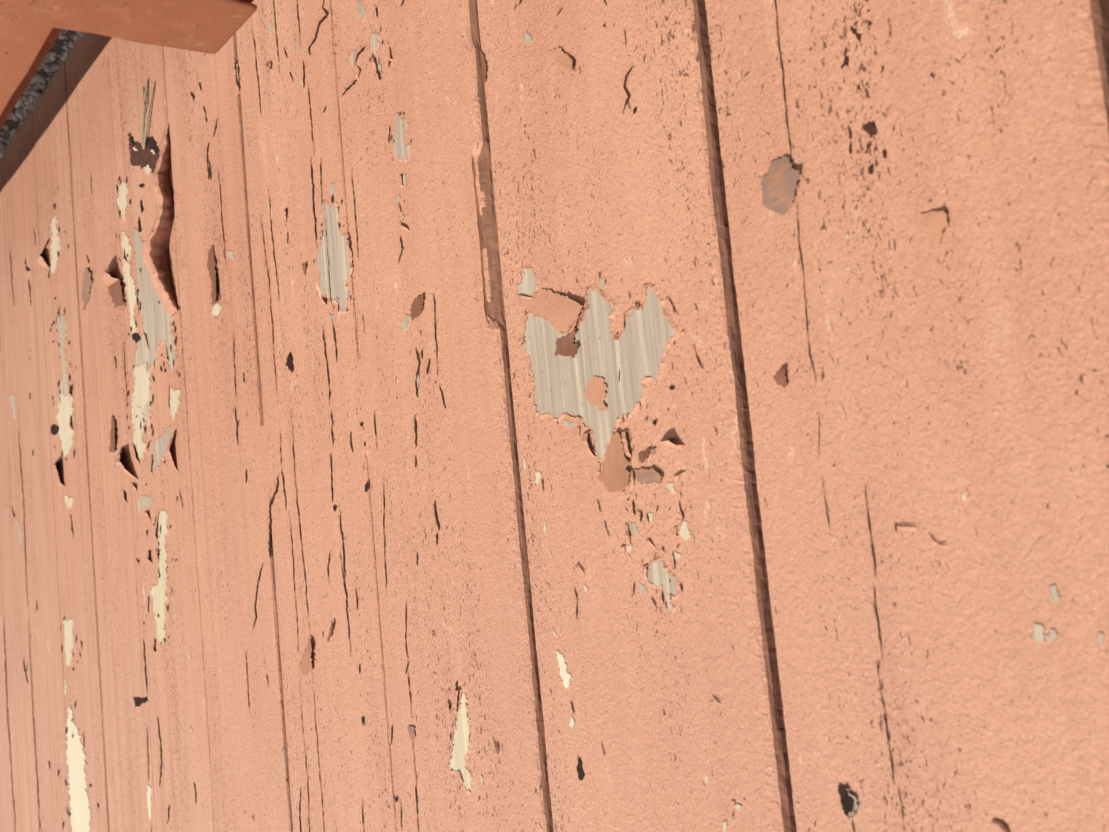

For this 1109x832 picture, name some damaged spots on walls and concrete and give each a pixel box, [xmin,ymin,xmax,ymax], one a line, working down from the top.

peeling [302,182,358,321]
peeling [760,156,800,215]
peeling [50,311,76,511]
peeling [81,177,182,652]
peeling [524,456,542,486]
peeling [516,265,680,473]
peeling [621,512,692,617]
peeling [1032,622,1060,647]
peeling [58,618,99,832]
peeling [448,682,484,794]